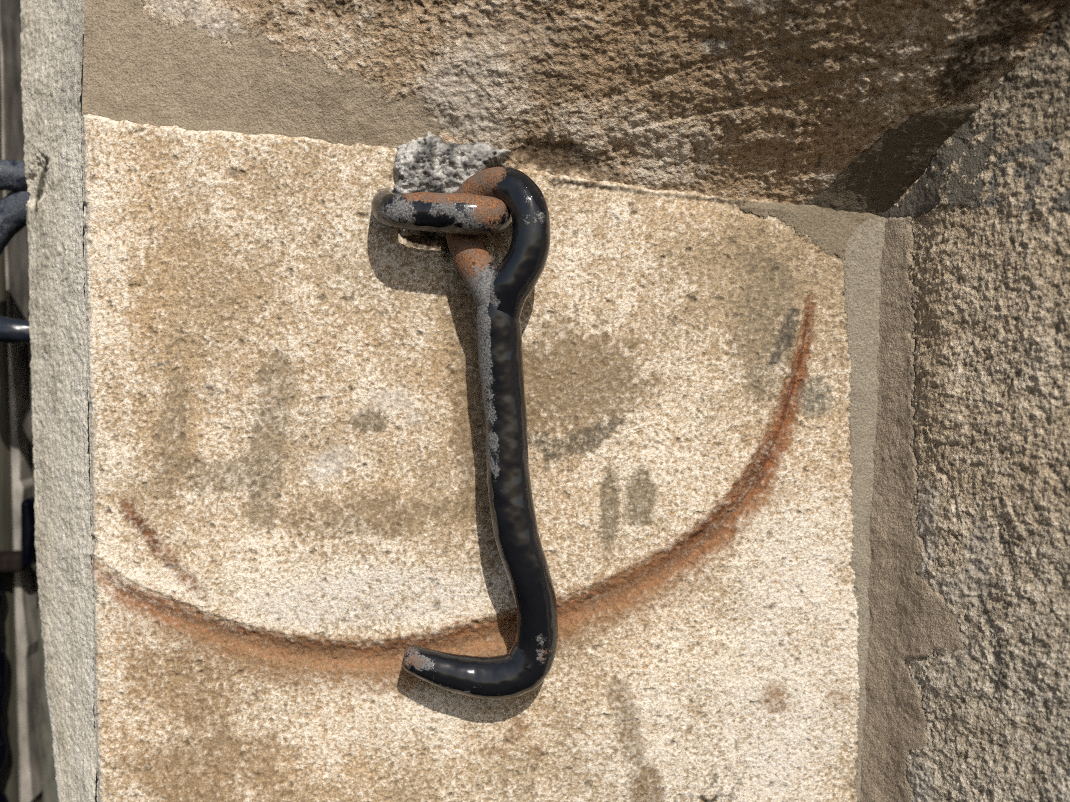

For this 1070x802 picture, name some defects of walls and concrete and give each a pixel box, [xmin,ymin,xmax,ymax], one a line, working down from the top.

corrosion [556,295,813,650]
corrosion [121,501,196,588]
corrosion [101,574,517,690]